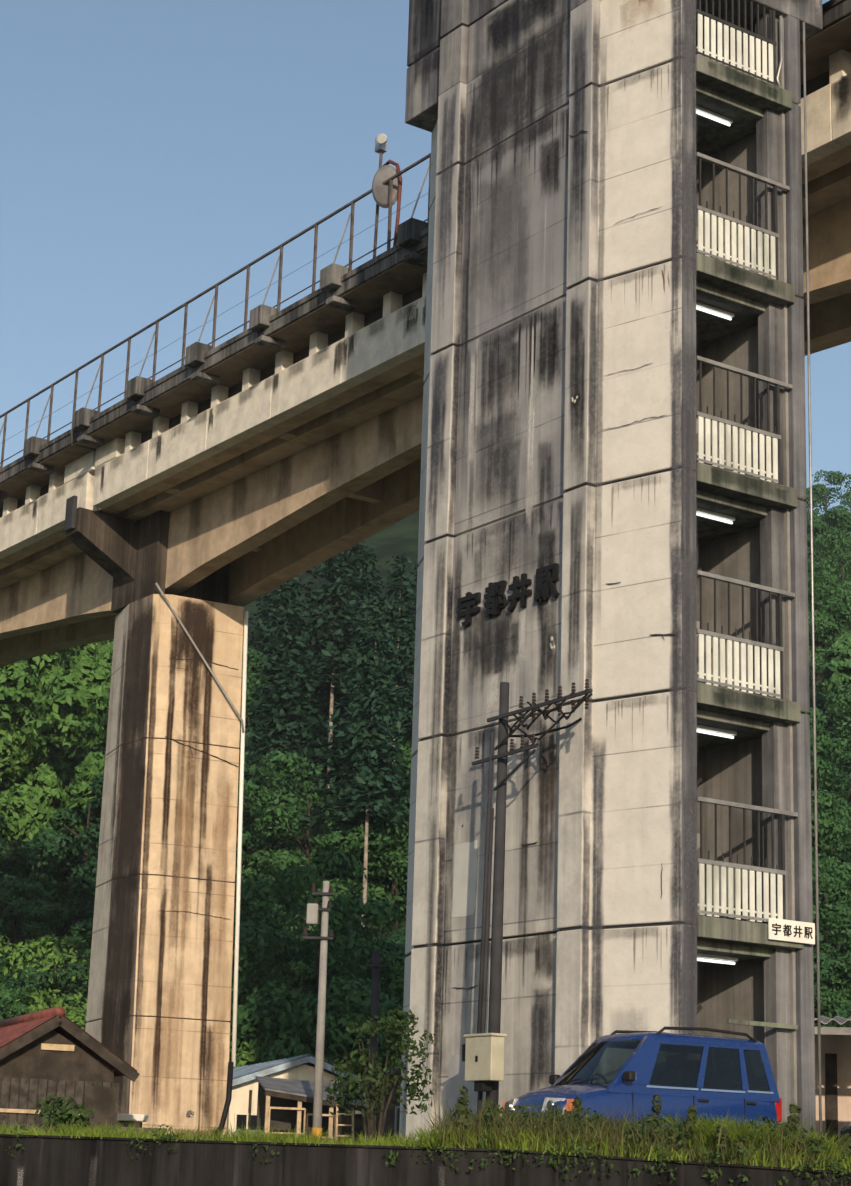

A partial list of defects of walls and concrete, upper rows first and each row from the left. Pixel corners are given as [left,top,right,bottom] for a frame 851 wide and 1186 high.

leakage [671,0,696,126]
leakage [835,77,851,112]
leakage [431,0,605,492]
leakage [672,154,697,293]
leakage [672,350,696,535]
leakage [670,548,697,751]
leakage [103,602,214,1059]
leakage [152,895,166,1090]
leakage [199,866,212,1109]
leakage [433,569,555,1094]
leakage [570,508,604,1039]
leakage [671,793,697,1035]